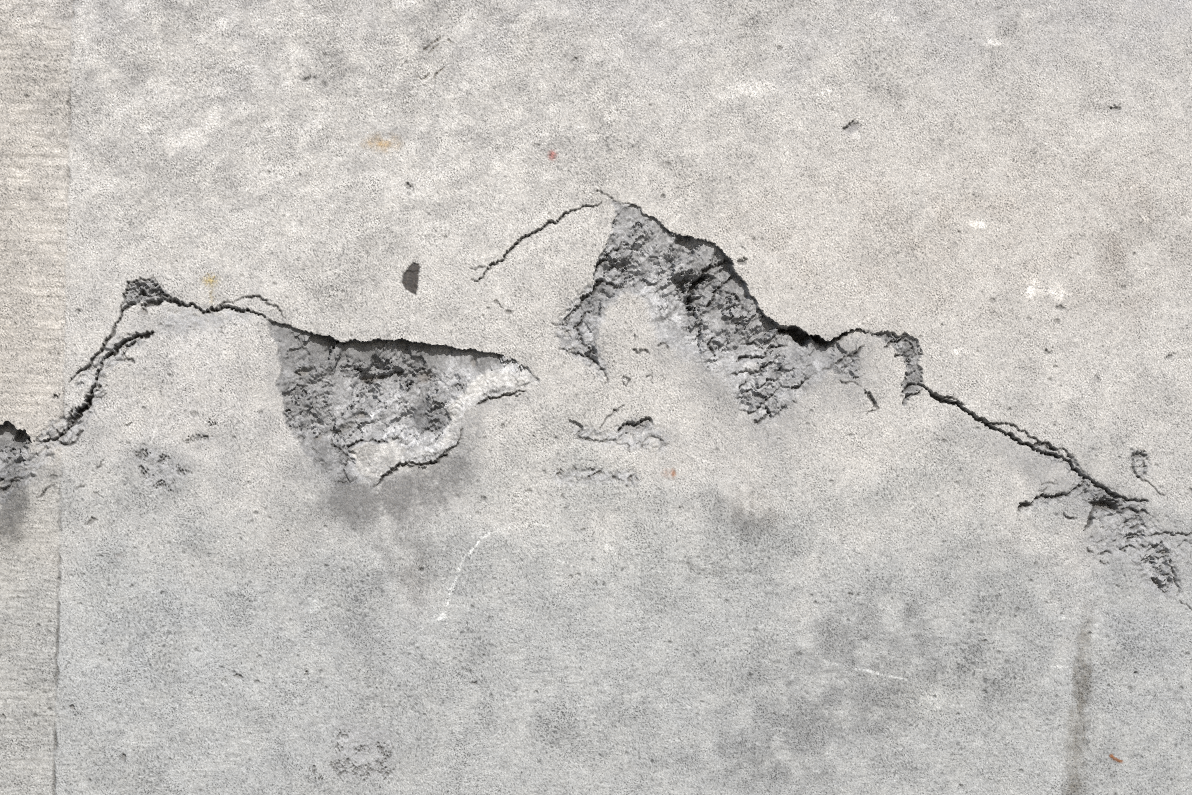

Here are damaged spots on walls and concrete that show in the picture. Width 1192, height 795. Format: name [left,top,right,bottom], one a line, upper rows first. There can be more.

crack [470,190,614,283]
spalling [0,421,33,492]
crack [34,295,287,448]
spalling [263,318,540,490]
spalling [551,199,927,434]
crack [922,385,1149,513]
spalling [1063,485,1192,612]